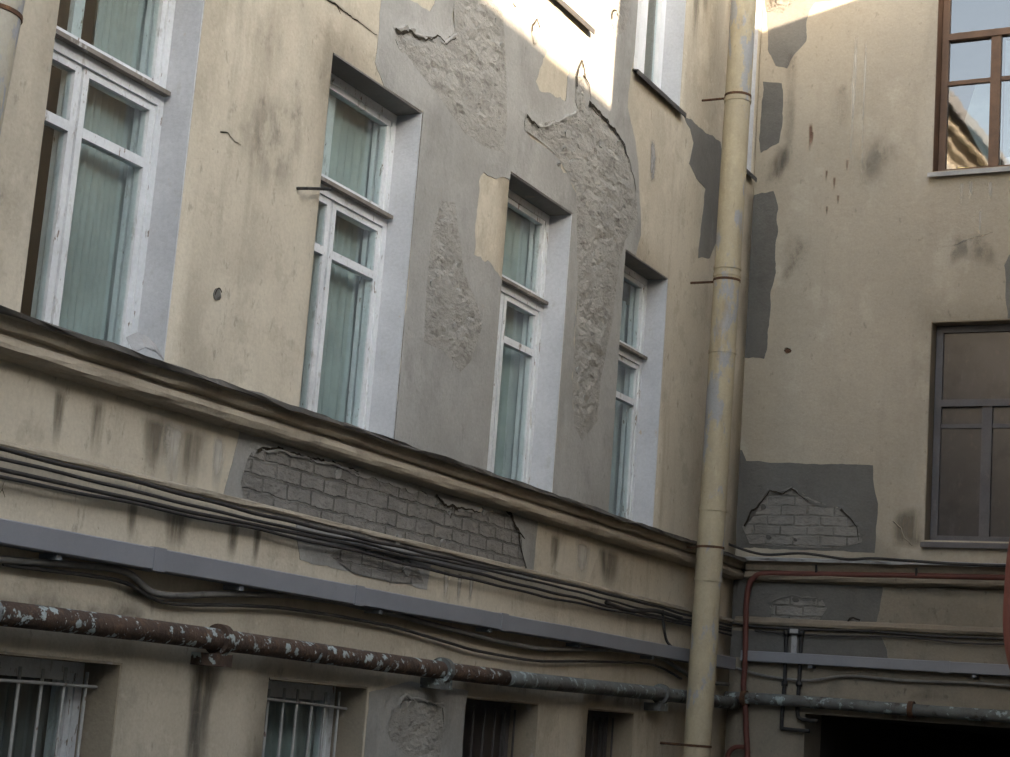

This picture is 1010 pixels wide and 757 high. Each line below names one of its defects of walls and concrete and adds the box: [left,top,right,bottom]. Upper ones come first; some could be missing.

spalling [393,0,521,153]
spalling [599,0,631,43]
spalling [765,0,795,12]
spalling [424,200,482,372]
spalling [524,60,638,440]
spalling [241,445,525,584]
spalling [388,693,446,757]